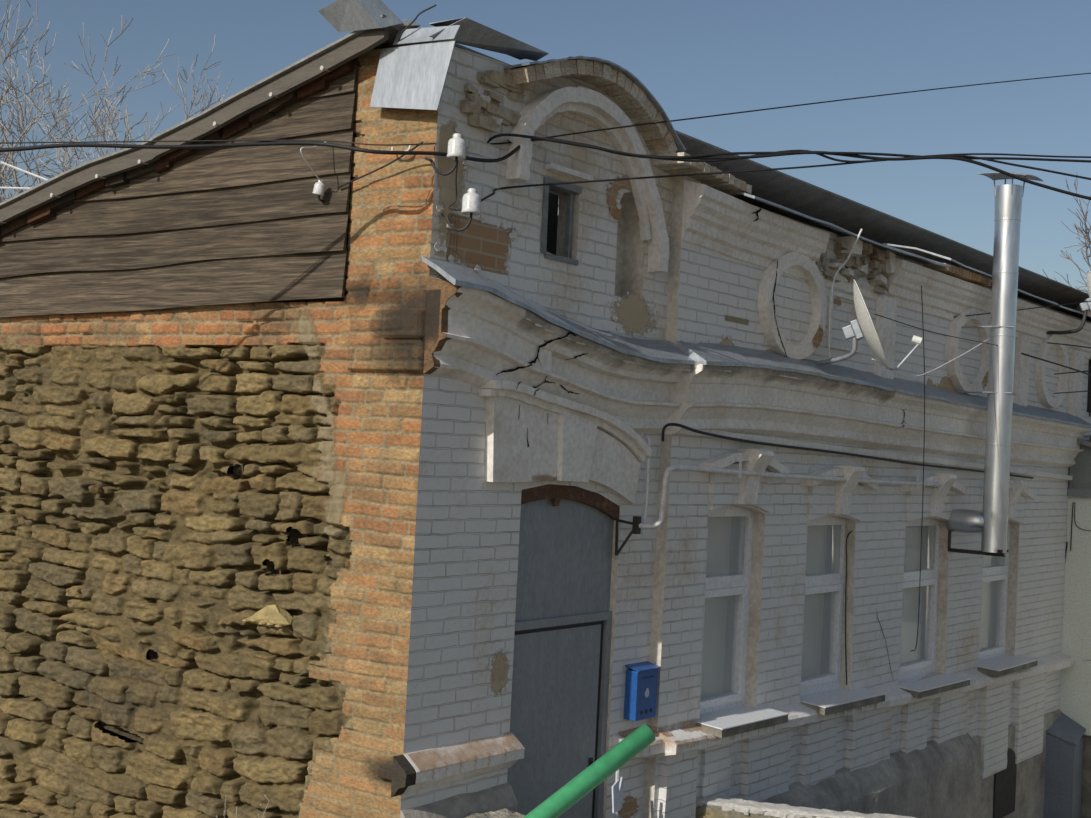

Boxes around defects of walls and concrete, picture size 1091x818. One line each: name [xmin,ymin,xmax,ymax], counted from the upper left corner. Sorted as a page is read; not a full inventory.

flaking render [434,68,527,275]
flaking render [607,176,634,221]
water stain [377,289,441,371]
peeling [611,292,656,338]
crack [496,331,589,448]